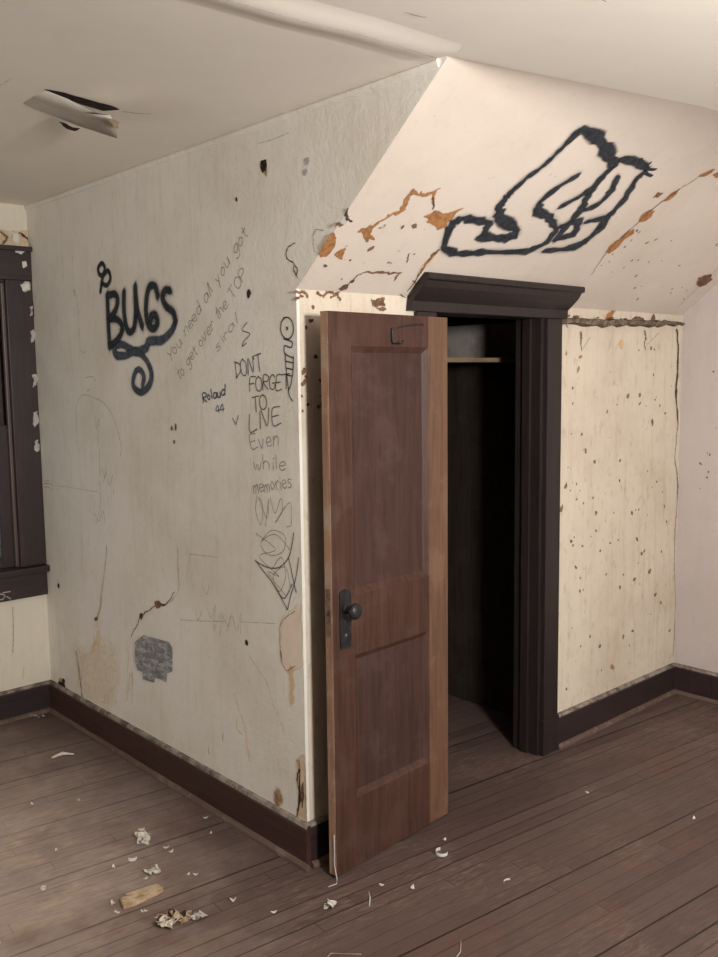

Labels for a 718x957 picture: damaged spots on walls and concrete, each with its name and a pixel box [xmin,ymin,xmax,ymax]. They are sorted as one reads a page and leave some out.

peeling [23,89,139,138]
peeling [319,188,463,267]
crack [696,274,712,287]
crack [130,575,179,642]
peeling [279,604,303,703]
flaking render [296,754,307,822]